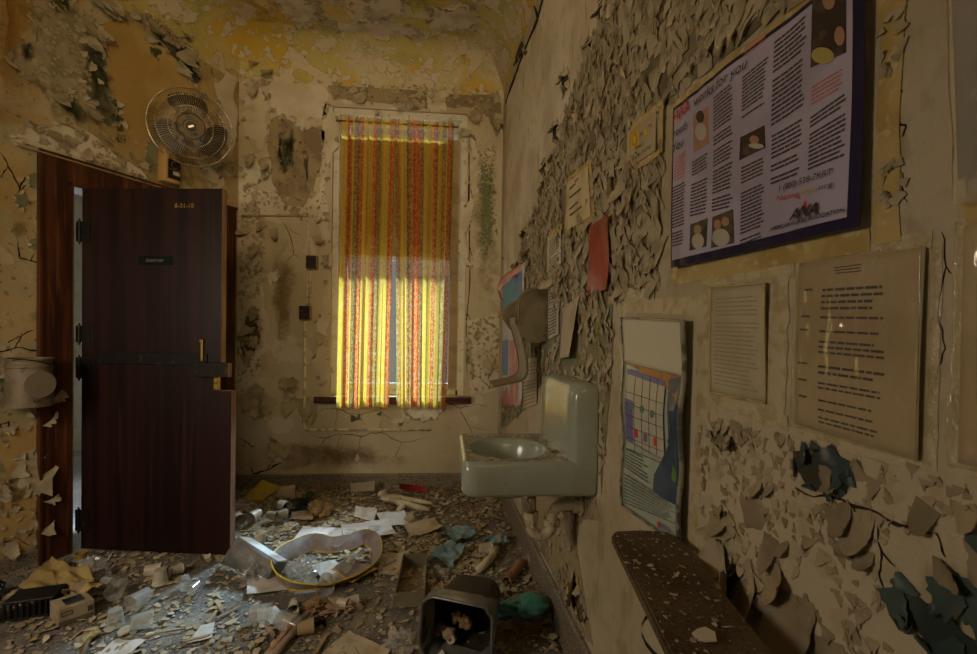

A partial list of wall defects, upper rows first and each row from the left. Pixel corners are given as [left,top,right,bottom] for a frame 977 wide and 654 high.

crack [0,152,29,193]
leakage [60,98,86,122]
leakage [89,49,126,143]
leakage [275,268,289,324]
mould [278,136,308,178]
peeling [3,0,804,495]
mould [477,147,500,262]
peeling [0,390,69,561]
crack [316,407,422,456]
peeling [532,496,601,646]
peeling [616,418,977,654]
crack [796,488,946,588]